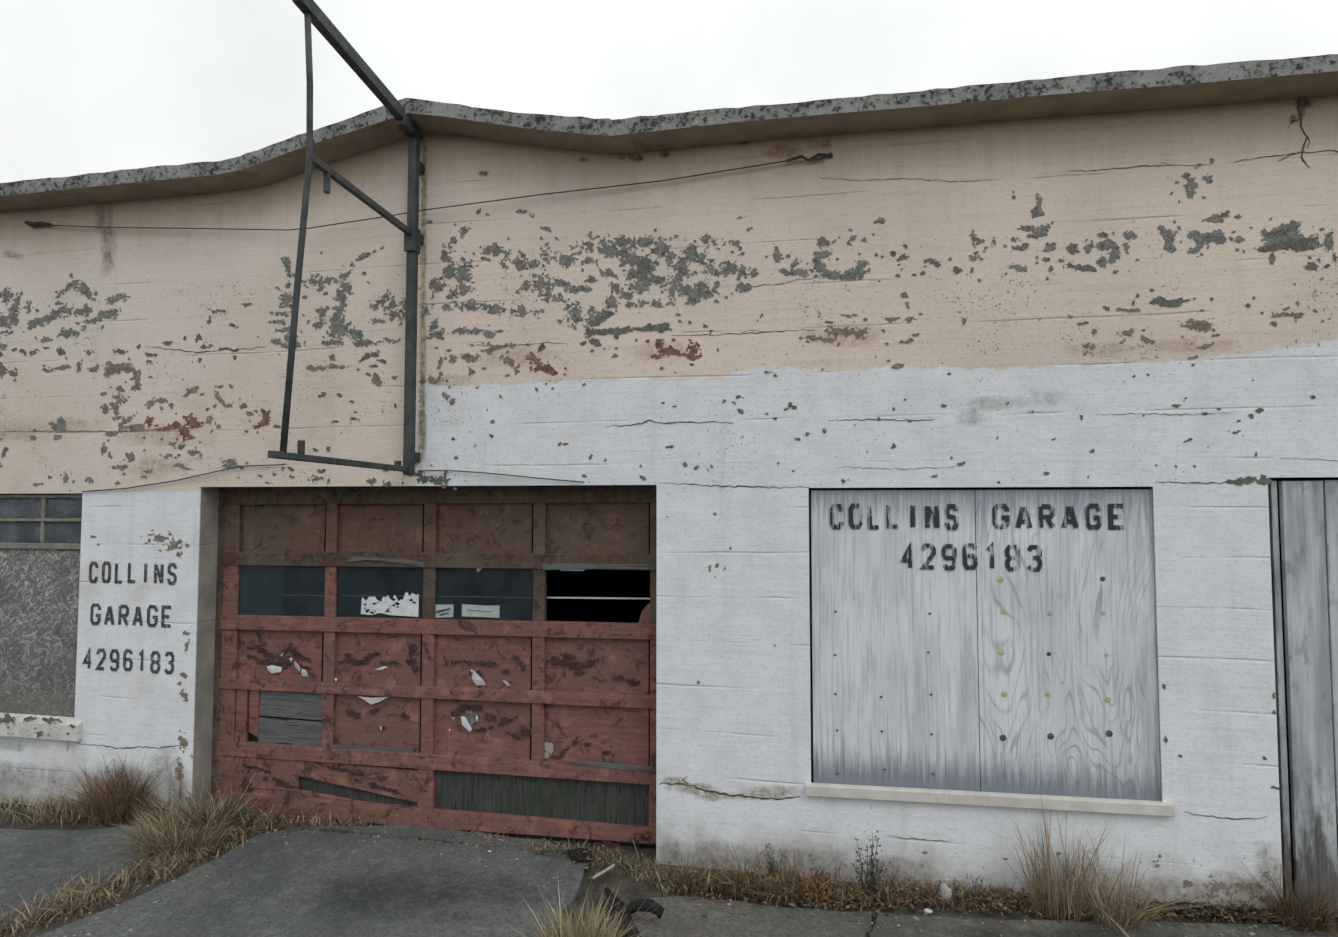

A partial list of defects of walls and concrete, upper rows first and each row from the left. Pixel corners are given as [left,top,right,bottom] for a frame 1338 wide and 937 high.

crack [1069,98,1338,171]
peeling [1170,158,1214,203]
spalling [1158,210,1338,270]
peeling [257,193,1139,405]
peeling [1103,289,1220,367]
peeling [1246,296,1325,326]
peeling [33,473,94,491]
peeling [221,458,330,484]
peeling [366,456,459,490]
crack [659,776,800,800]
crack [866,912,878,937]